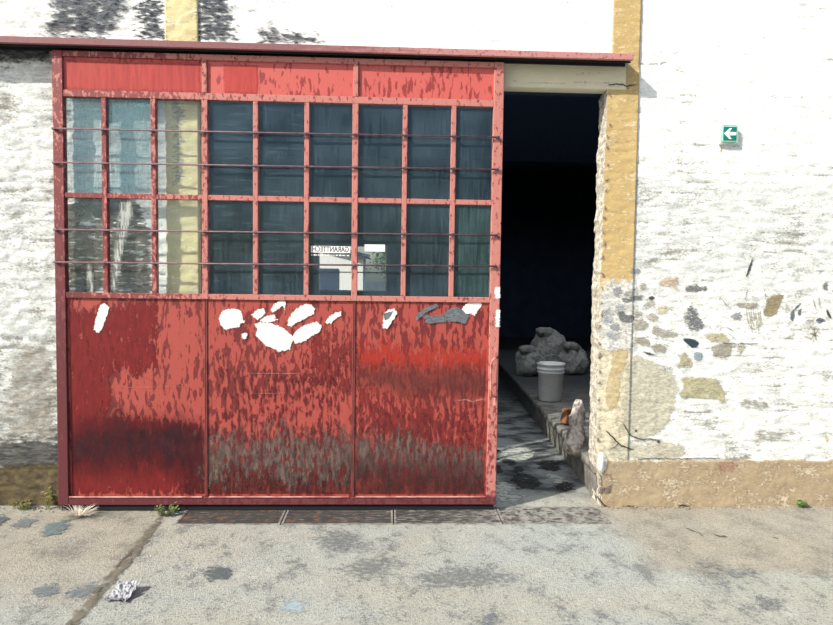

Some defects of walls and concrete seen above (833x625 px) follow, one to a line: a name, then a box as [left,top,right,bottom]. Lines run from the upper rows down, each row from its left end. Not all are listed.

leakage [42,0,167,39]
leakage [195,0,238,42]
leakage [256,22,325,45]
flaking render [597,273,686,465]
peeling [69,298,487,494]
crack [605,425,719,460]